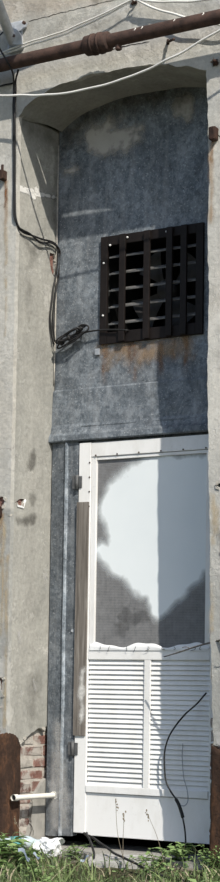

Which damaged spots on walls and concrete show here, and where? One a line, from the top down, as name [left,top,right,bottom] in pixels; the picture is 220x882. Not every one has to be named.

flaking render [19,726,57,839]
flaking render [210,718,220,797]